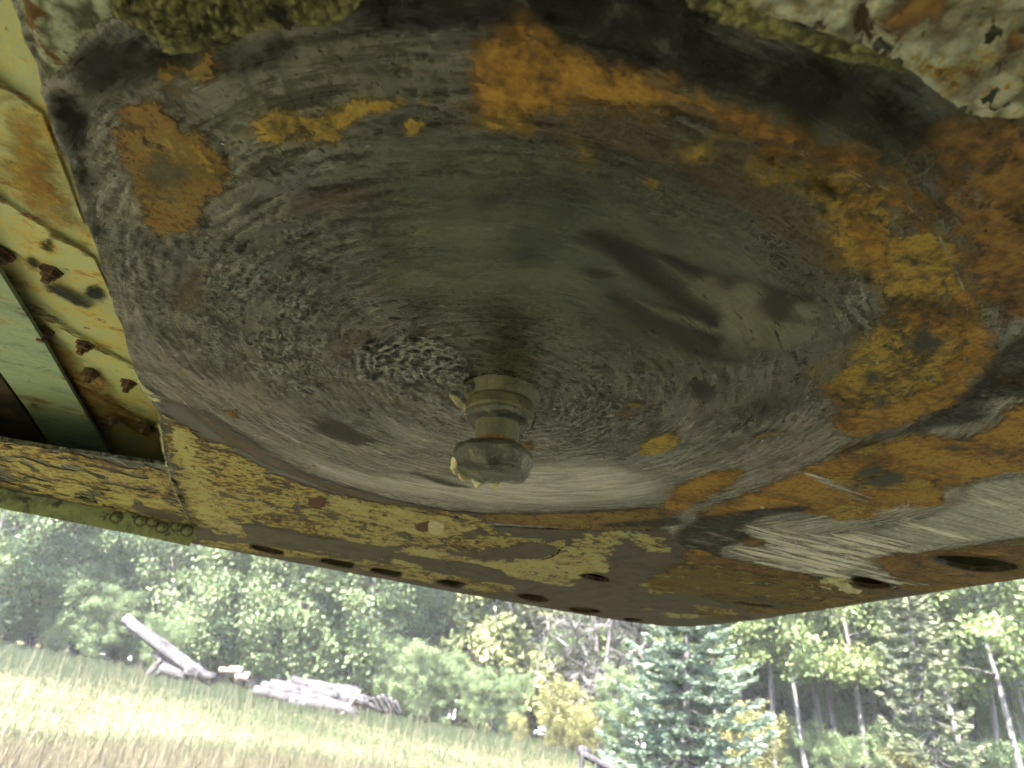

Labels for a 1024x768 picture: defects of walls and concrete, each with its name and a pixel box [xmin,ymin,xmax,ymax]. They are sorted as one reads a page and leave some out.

corrosion [107,97,236,238]
corrosion [190,19,1024,531]
corrosion [46,339,156,435]
peeling [0,415,672,593]
corrosion [738,536,765,547]
corrosion [648,538,1024,619]